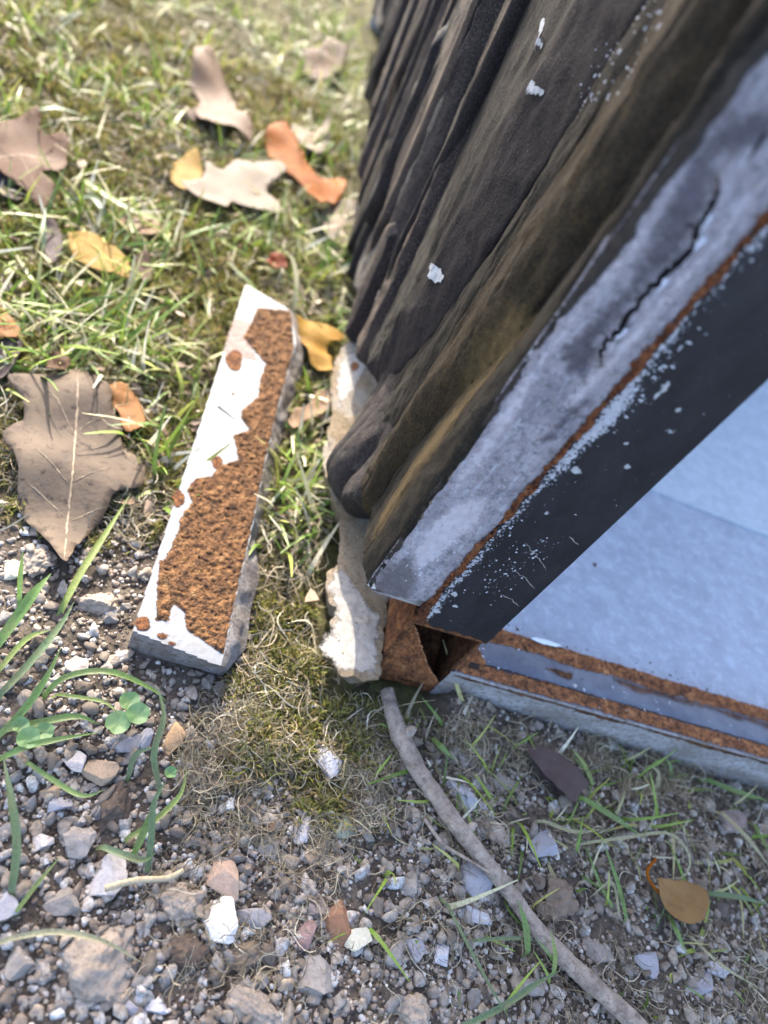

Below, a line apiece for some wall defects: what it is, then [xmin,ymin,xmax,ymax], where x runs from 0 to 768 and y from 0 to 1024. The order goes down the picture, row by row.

crack [747,133,768,161]
peeling [224,318,258,361]
damp [374,115,768,598]
crack [597,176,720,369]
rust [411,211,768,764]
peeling [531,637,562,647]